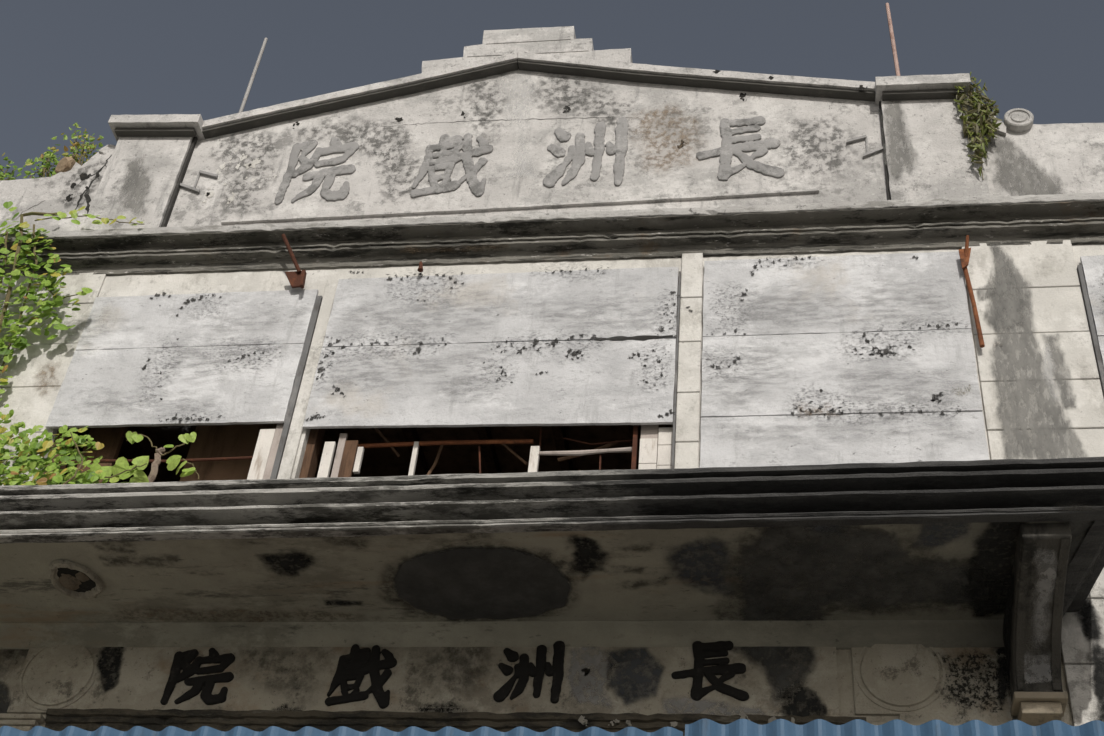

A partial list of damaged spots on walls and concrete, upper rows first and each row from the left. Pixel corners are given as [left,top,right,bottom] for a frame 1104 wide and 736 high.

crack [75,156,111,214]
damp [123,161,150,213]
damp [977,245,1084,459]
spalling [48,560,105,600]
damp [262,551,313,576]
damp [570,536,607,575]
damp [667,514,1026,719]
damp [0,682,10,713]
damp [97,647,124,692]
damp [607,648,663,704]
damp [1075,600,1104,722]